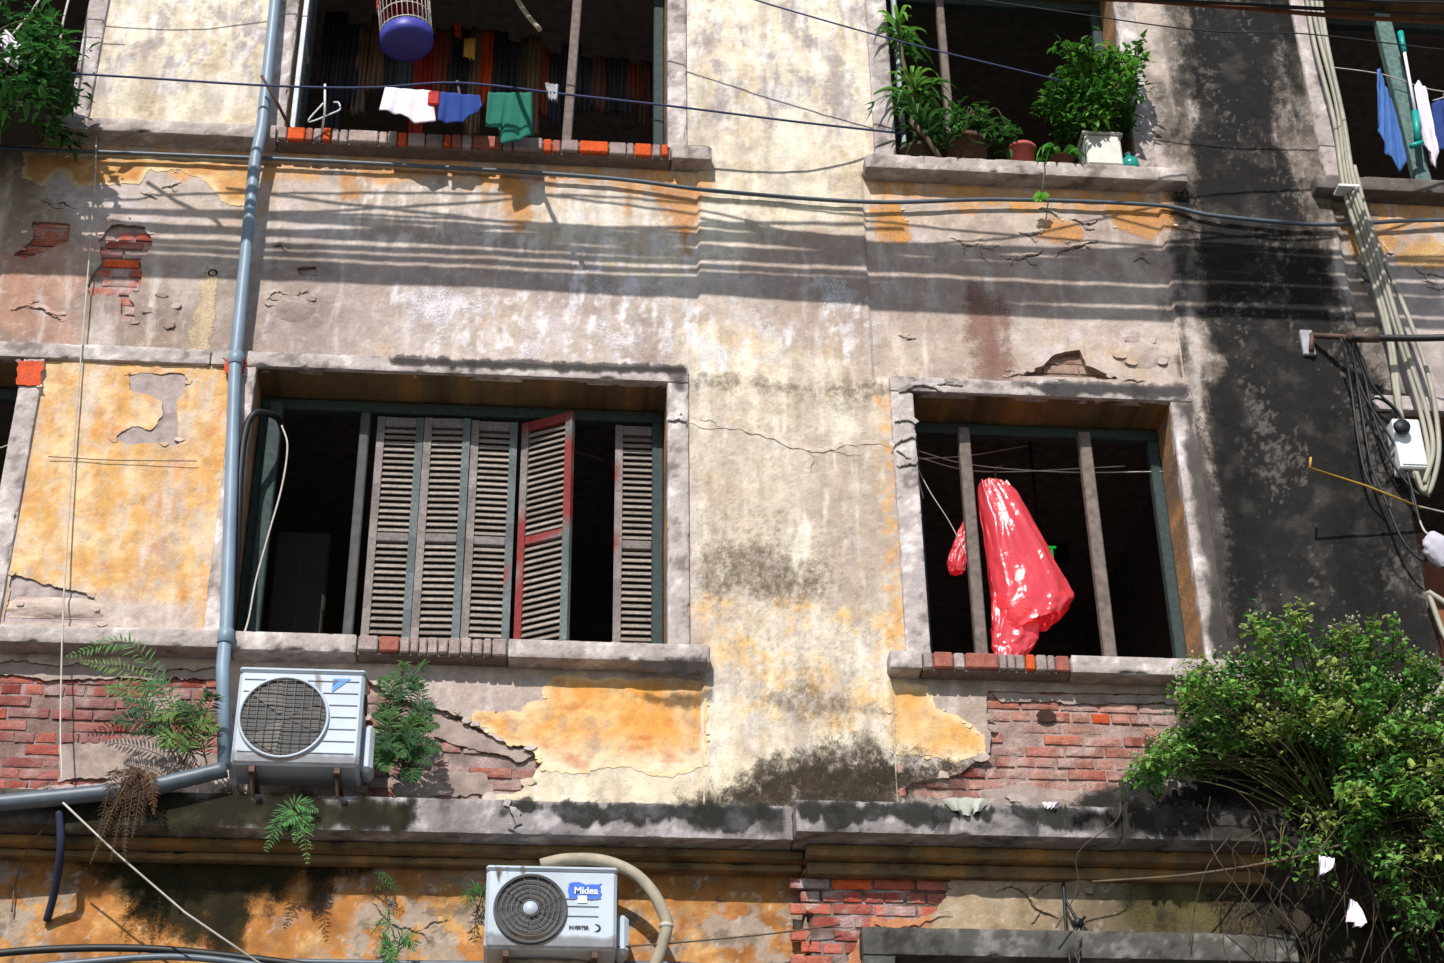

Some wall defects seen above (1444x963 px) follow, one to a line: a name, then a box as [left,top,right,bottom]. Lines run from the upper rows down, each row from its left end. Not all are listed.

spalling [13,223,70,259]
spalling [88,226,155,325]
peeling [1036,219,1083,243]
peeling [1105,205,1178,238]
spalling [109,371,192,447]
leakage [500,0,1444,845]
spalling [1025,354,1116,380]
spalling [0,661,218,790]
peeling [354,675,710,800]
spalling [886,680,1195,802]
leakage [77,862,374,953]
spalling [787,854,958,963]